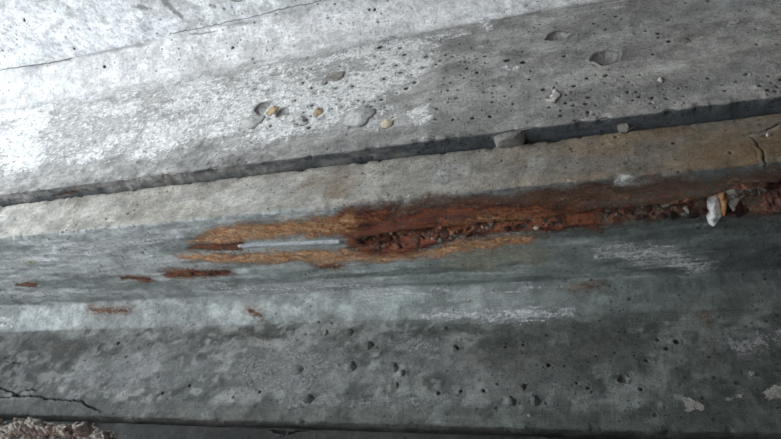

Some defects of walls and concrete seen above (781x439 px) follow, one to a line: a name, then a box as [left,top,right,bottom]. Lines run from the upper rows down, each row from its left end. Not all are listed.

crack [739,119,781,169]
spalling [357,214,575,250]
corrosion [163,168,781,279]
spalling [613,173,654,187]
spalling [593,197,708,225]
spalling [719,180,781,218]
crack [0,357,104,416]
spalling [0,417,126,439]